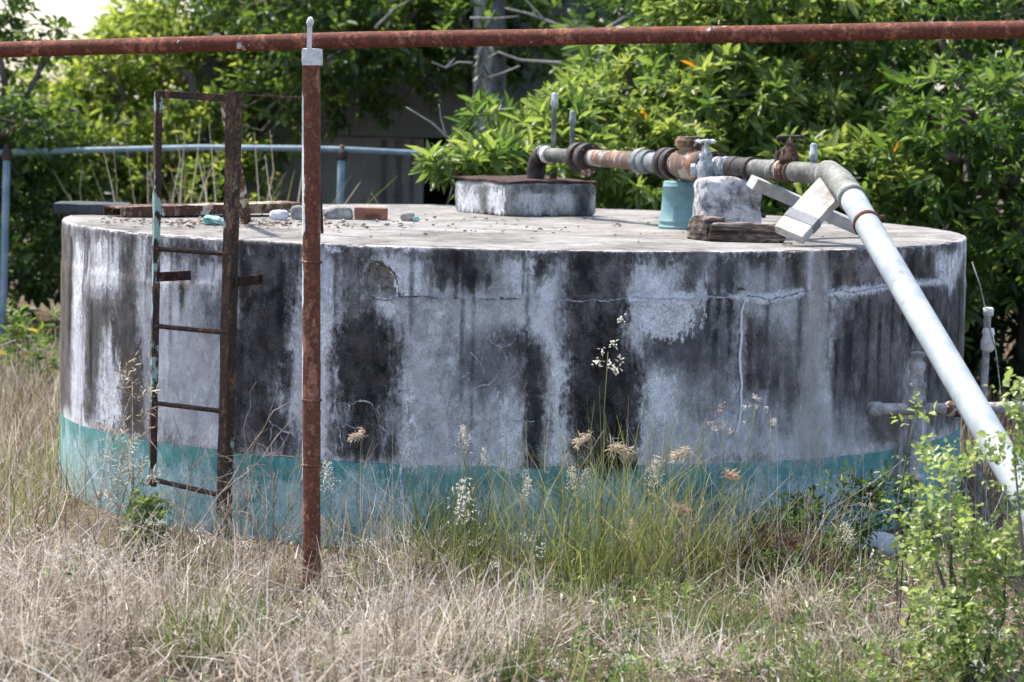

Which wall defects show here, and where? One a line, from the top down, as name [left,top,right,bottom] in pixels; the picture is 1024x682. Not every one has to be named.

damp [59,222,223,434]
damp [234,240,303,458]
peeling [329,246,577,531]
damp [320,242,966,474]
crack [557,283,888,435]